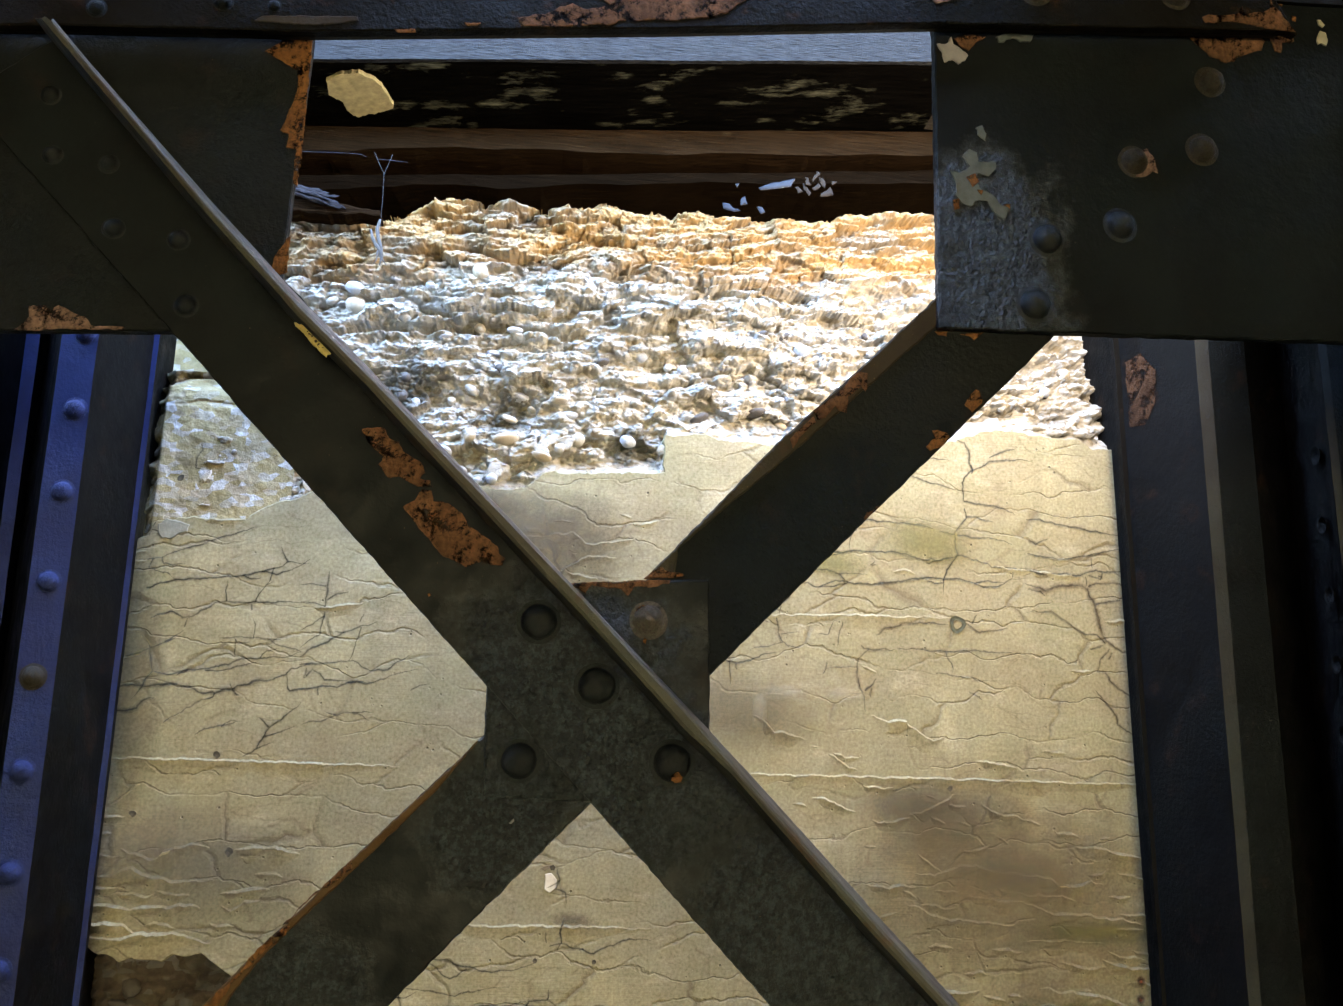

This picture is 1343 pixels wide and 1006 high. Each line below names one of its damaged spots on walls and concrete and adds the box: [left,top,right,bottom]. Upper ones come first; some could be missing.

corrosion [518,0,746,27]
corrosion [1190,0,1296,63]
corrosion [265,39,313,186]
peeling [950,126,1009,221]
corrosion [14,305,124,331]
spalling [284,197,936,490]
spalling [948,336,1108,450]
corrosion [362,427,505,567]
crack [117,527,426,757]
crack [725,440,1133,735]
corrosion [204,860,352,1006]
crack [396,871,646,1006]